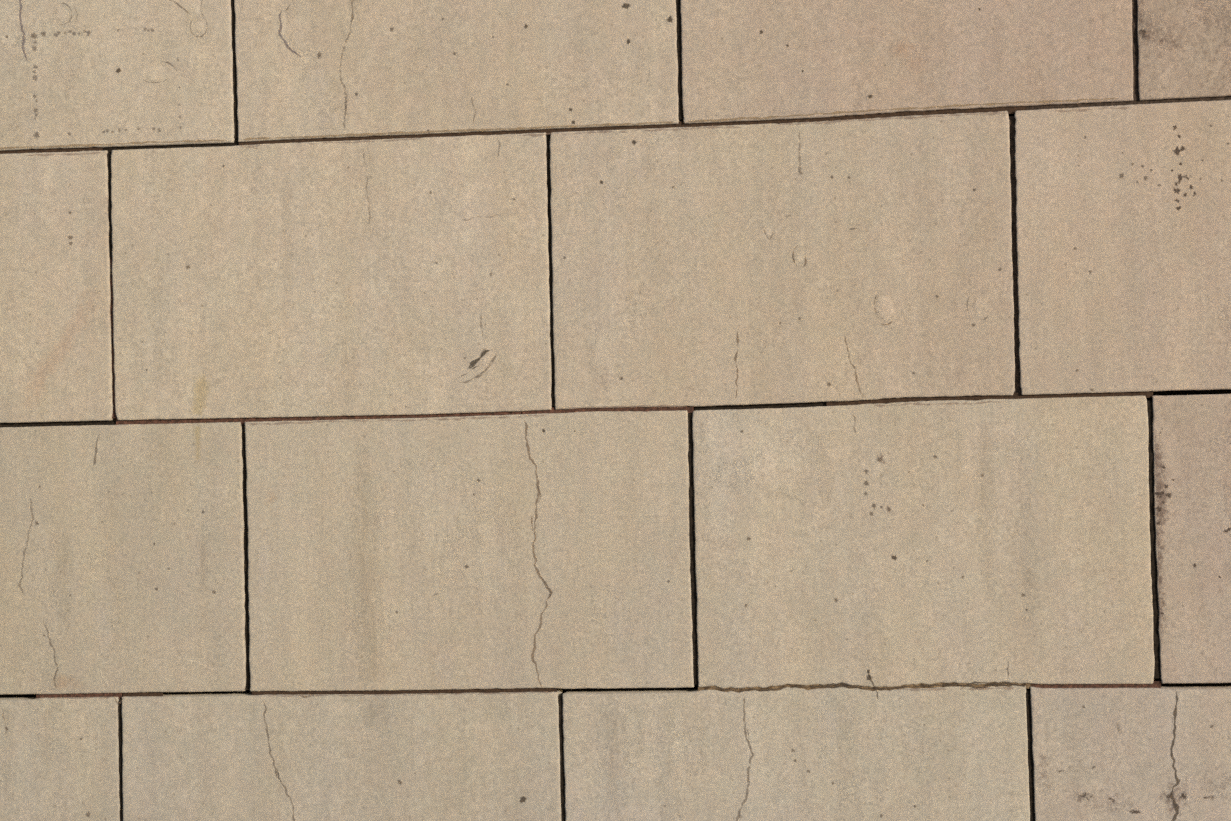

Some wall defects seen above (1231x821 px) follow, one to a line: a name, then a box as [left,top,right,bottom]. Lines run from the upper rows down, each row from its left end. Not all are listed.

crack [525,425,552,683]
crack [263,703,295,821]
crack [713,666,1025,821]
crack [1170,692,1183,821]